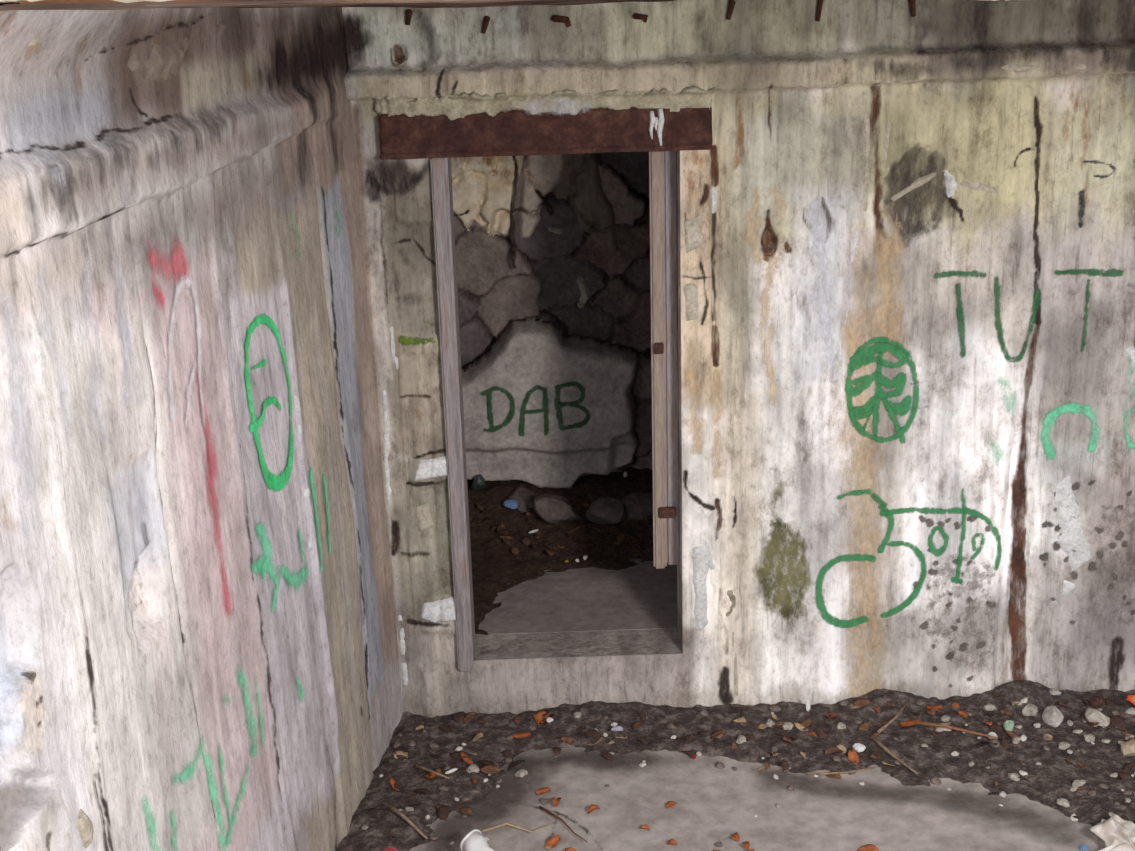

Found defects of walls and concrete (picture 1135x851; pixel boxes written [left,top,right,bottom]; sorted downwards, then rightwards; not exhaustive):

crack [87,16,204,60]
crack [0,88,172,159]
crack [6,208,125,257]
corrosion [746,196,791,405]
crack [1008,96,1043,680]
spalling [17,671,46,754]
spalling [0,786,27,851]
spalling [76,809,94,849]